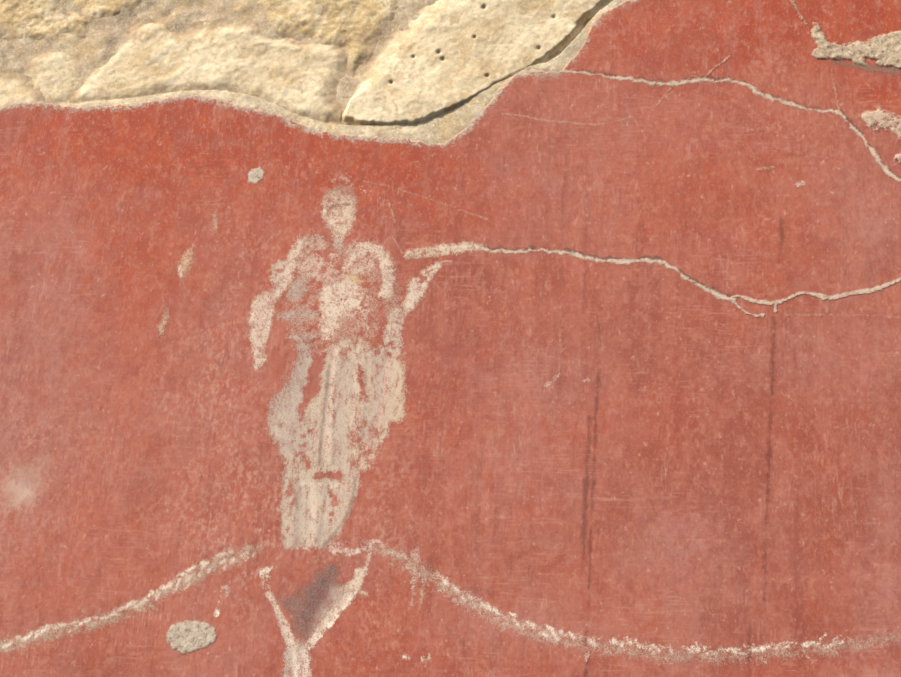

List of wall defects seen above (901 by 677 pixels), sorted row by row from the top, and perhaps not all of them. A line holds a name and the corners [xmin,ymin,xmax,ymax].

flaking render [789,0,901,74]
crack [526,55,901,182]
flaking render [856,105,901,140]
peeling [248,166,265,184]
peeling [177,244,195,280]
crack [477,246,901,317]